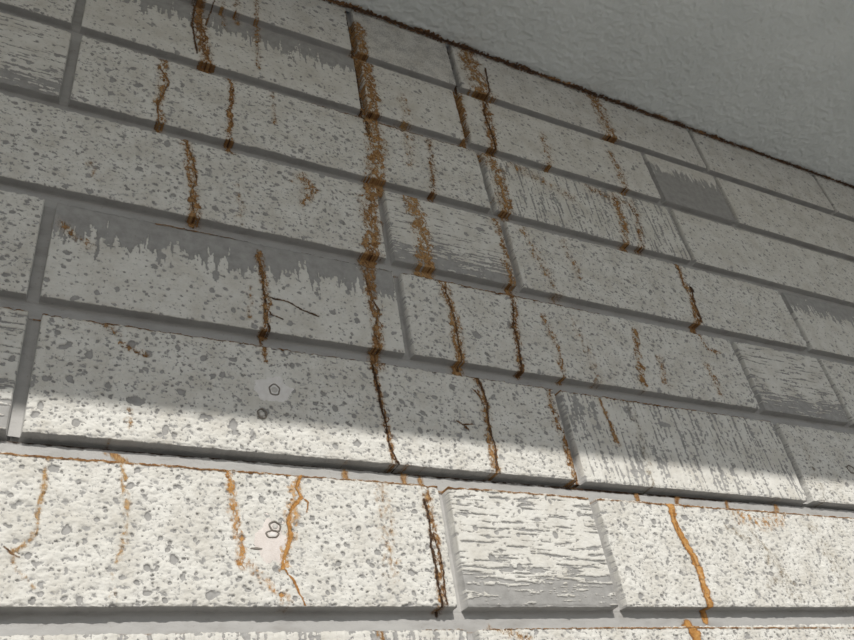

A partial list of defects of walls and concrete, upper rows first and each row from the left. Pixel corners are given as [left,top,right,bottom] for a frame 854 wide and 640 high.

crack [324,0,854,189]
corrosion [587,95,645,254]
corrosion [0,0,588,617]
corrosion [674,264,721,354]
corrosion [489,313,854,640]